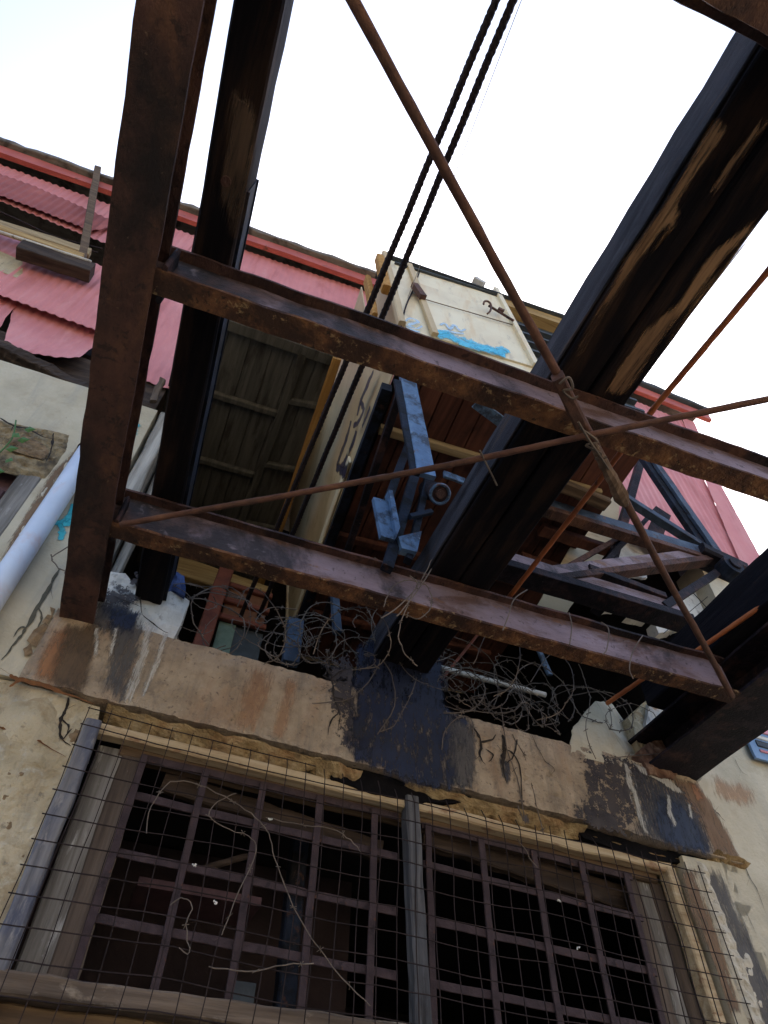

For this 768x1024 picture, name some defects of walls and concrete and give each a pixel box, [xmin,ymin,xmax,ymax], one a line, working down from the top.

crack [1,568,94,756]
corrosion [37,624,100,692]
peeling [696,849,765,1024]